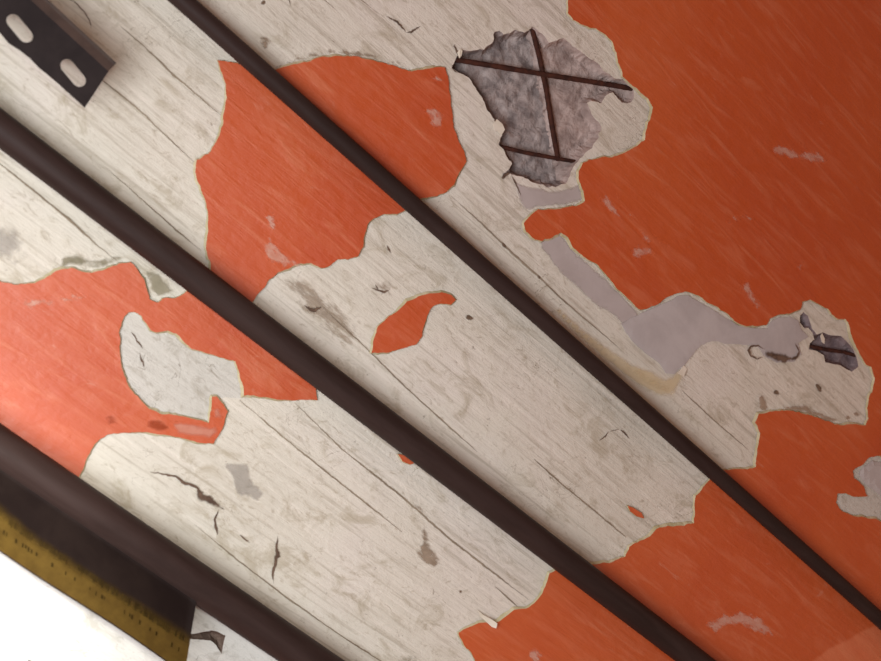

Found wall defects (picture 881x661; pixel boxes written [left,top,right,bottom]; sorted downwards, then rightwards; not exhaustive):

peeling [0,150,186,302]
peeling [0,0,239,270]
peeling [198,0,875,470]
peeling [0,552,164,661]
crack [152,472,223,535]
peeling [79,312,555,661]
peeling [253,210,710,564]
peeling [836,456,881,522]